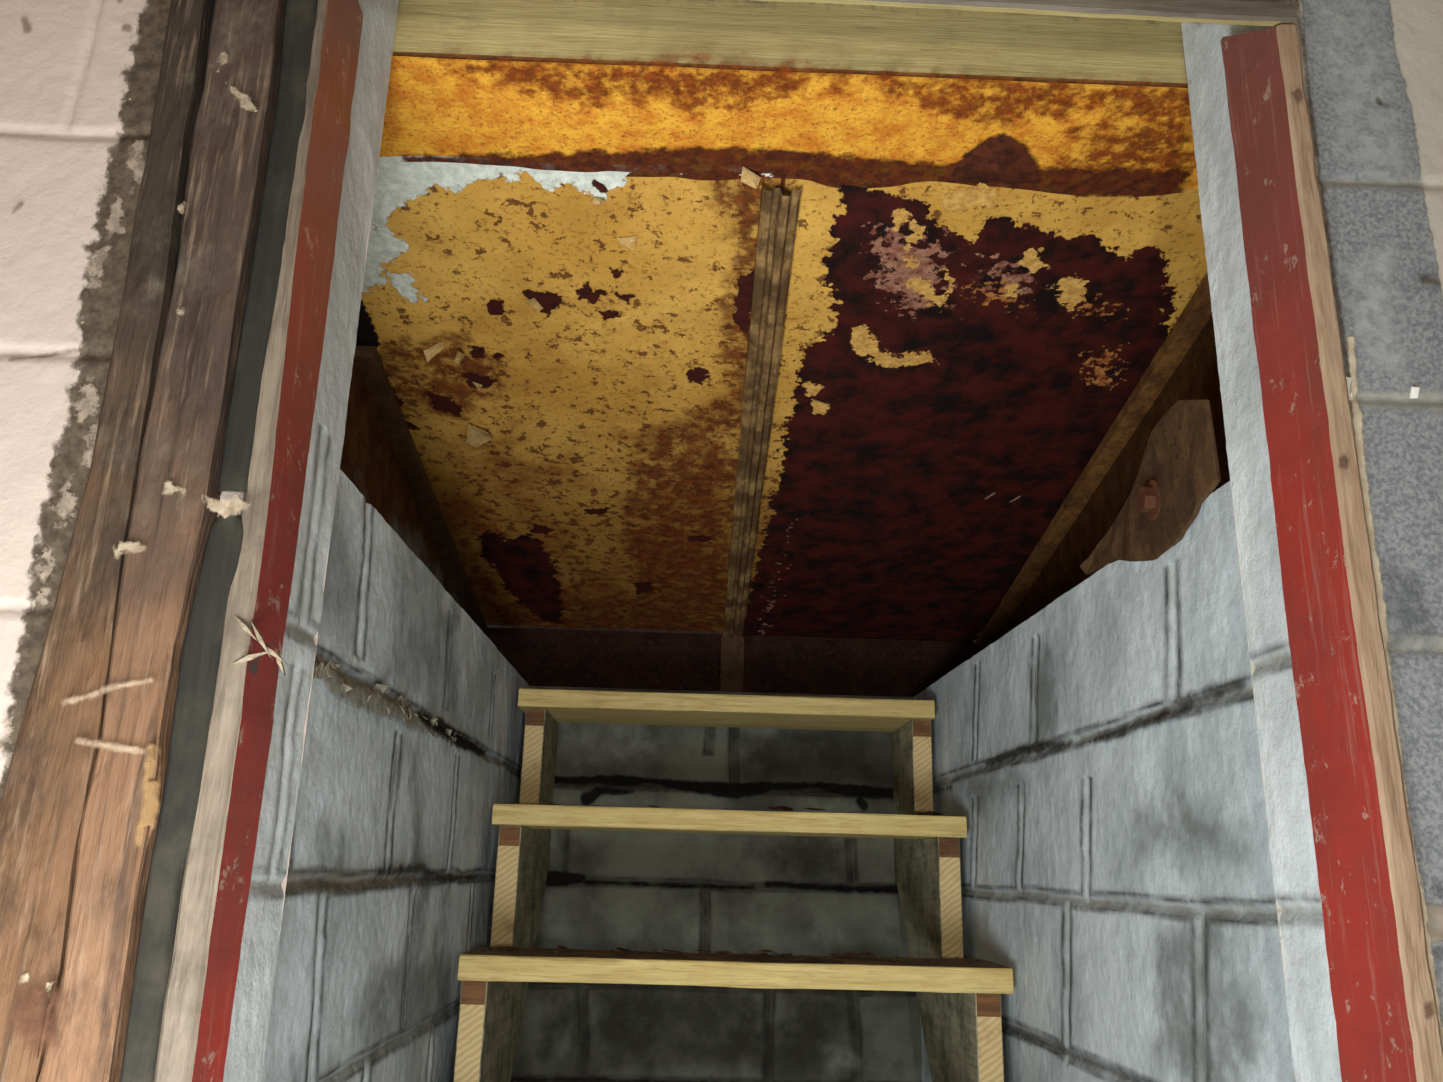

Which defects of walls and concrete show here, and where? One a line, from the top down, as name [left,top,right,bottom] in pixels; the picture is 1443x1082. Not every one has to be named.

corrosion [454,54,810,111]
peeling [526,298,543,311]
corrosion [379,334,504,430]
corrosion [402,73,1195,642]
crack [418,712,486,756]
crack [984,683,1243,768]
crack [554,775,894,811]
crack [378,863,477,883]